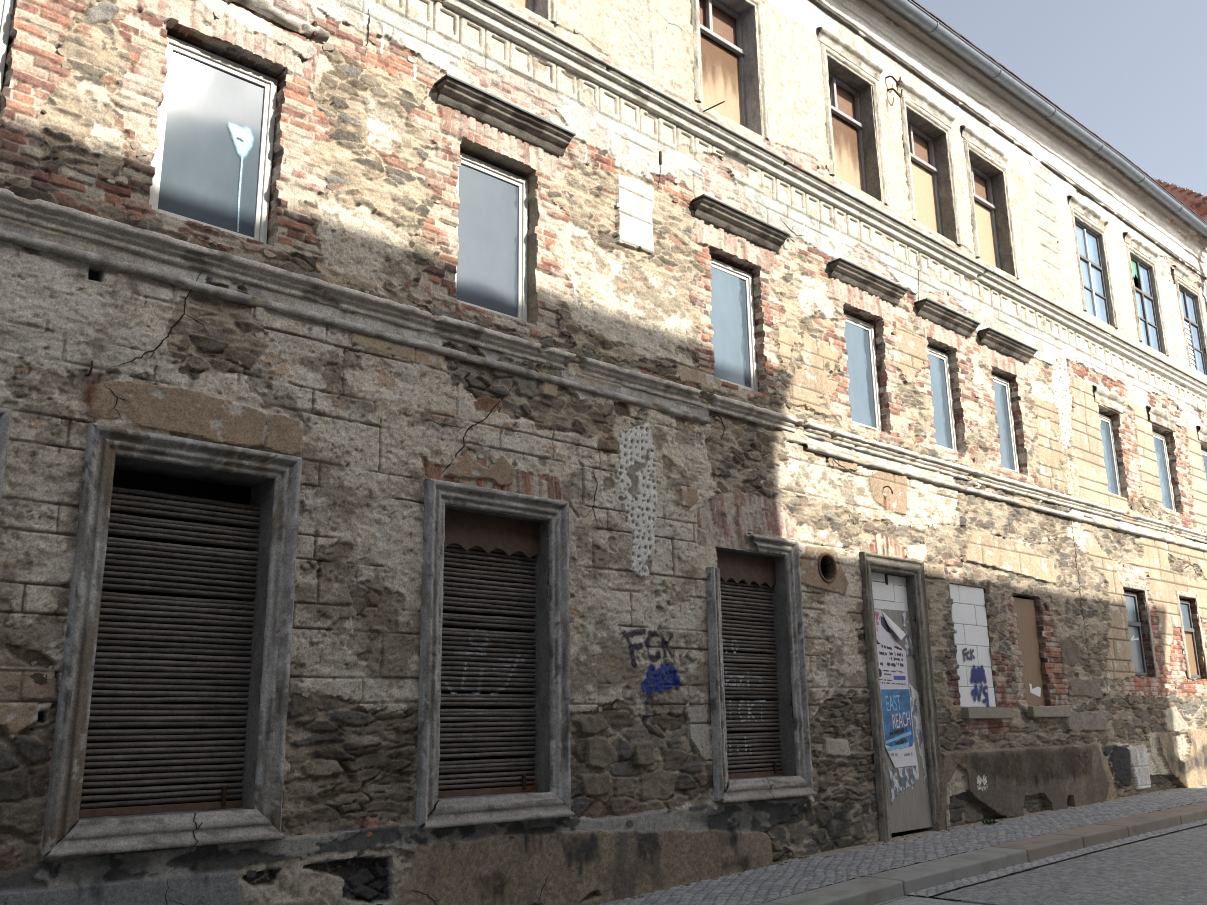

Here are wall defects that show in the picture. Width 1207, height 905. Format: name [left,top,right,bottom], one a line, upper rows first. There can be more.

crack [104,271,206,421]
crack [427,381,518,474]
flaking render [0,0,1207,577]
flaking render [696,410,1207,827]
peeling [0,642,880,905]